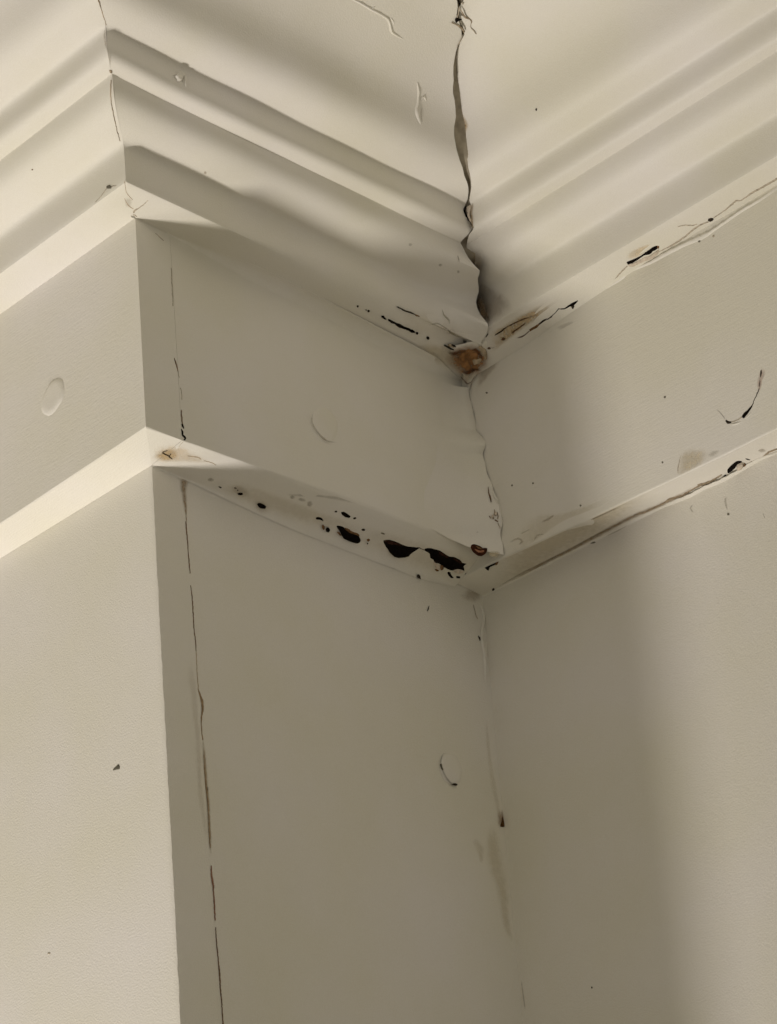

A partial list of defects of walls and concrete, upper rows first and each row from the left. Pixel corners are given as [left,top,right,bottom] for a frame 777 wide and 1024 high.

crack [452,0,476,264]
spalling [627,246,659,264]
rust [444,312,538,385]
crack [725,370,762,425]
peeling [723,459,750,477]
spalling [316,512,361,543]
spalling [383,540,466,571]
crack [161,358,224,1024]